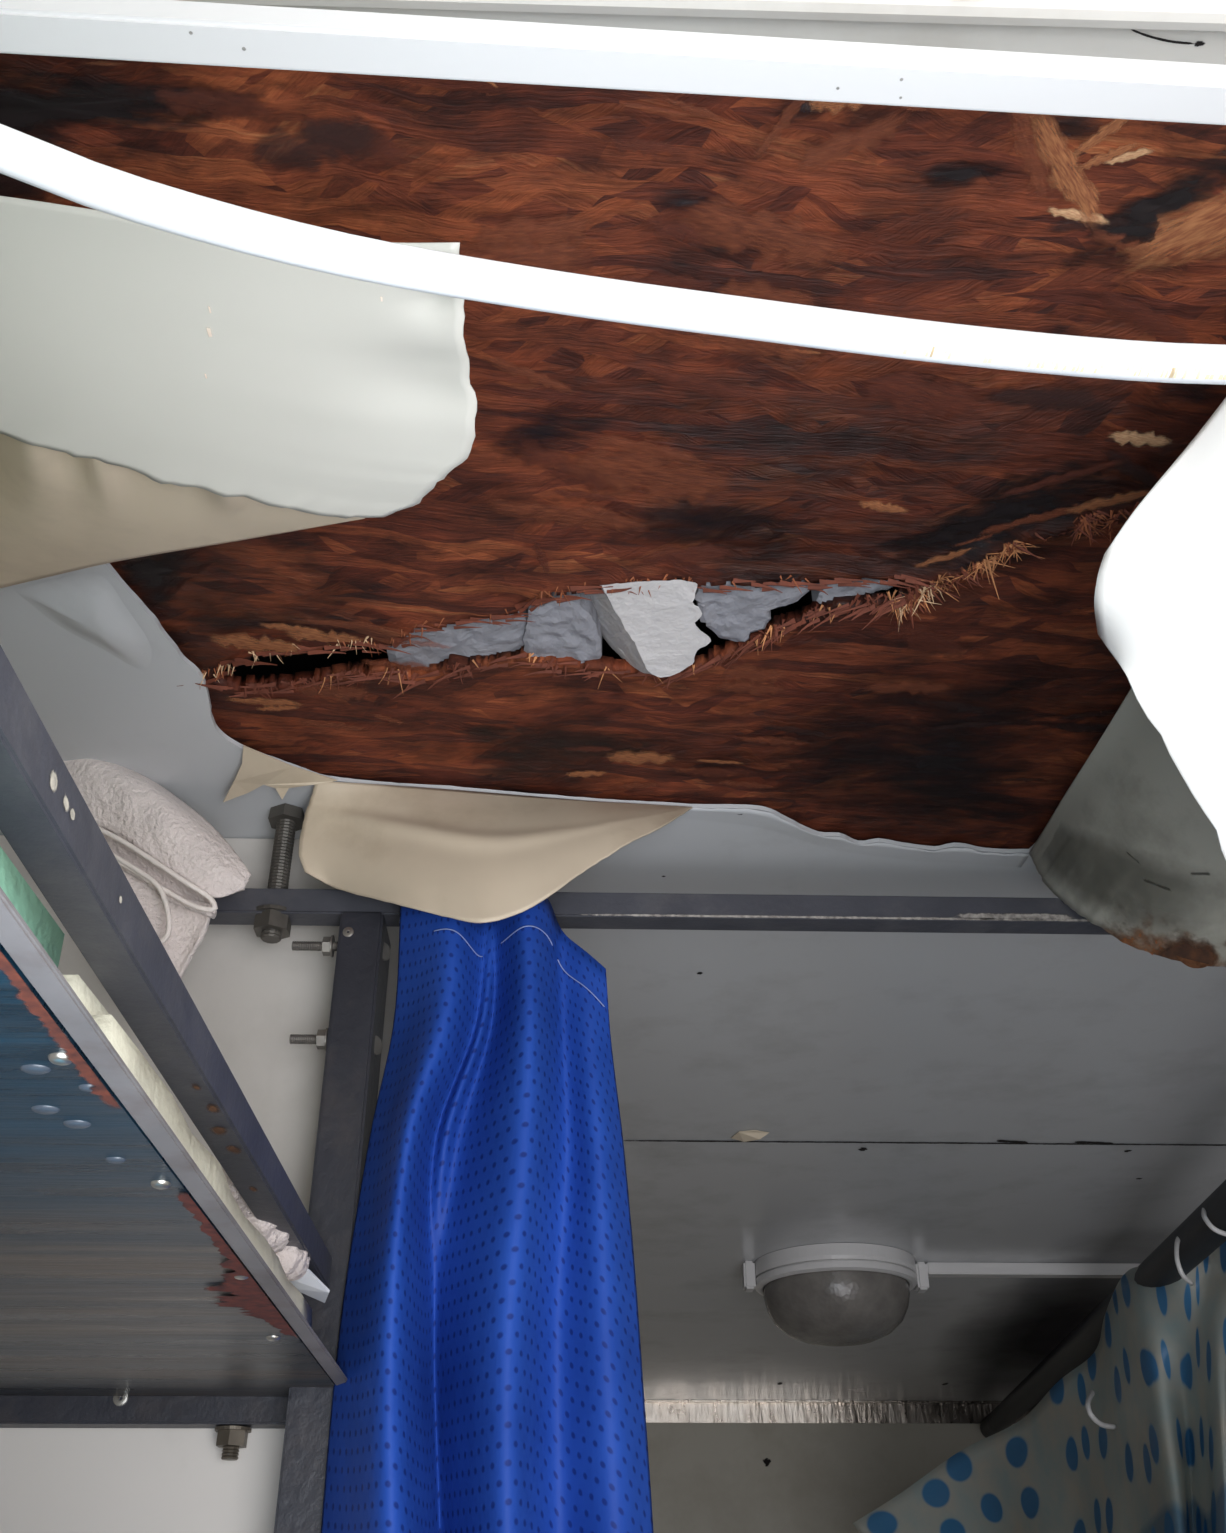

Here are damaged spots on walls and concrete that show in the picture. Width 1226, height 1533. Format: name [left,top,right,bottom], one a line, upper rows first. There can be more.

peeling [223,745,693,923]
rust [1112,930,1218,967]
rust [178,1193,297,1338]